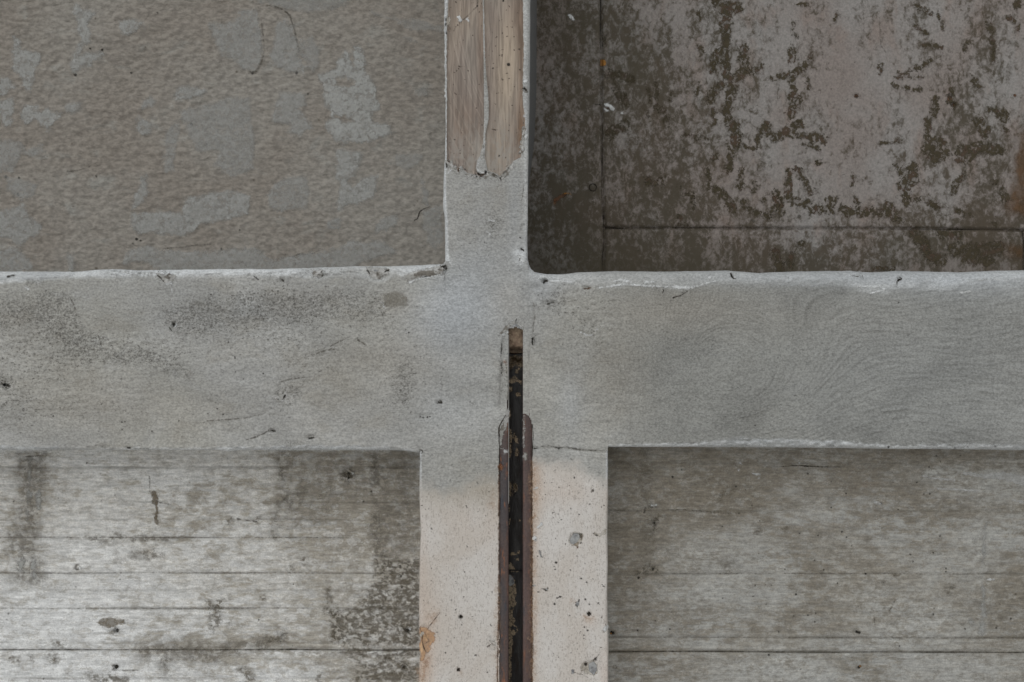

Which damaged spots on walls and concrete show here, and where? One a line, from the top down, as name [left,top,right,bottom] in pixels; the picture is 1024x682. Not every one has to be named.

mould [1004,0,1024,32]
damp [604,69,636,141]
damp [675,0,1013,267]
damp [769,240,805,272]
mould [326,559,419,682]